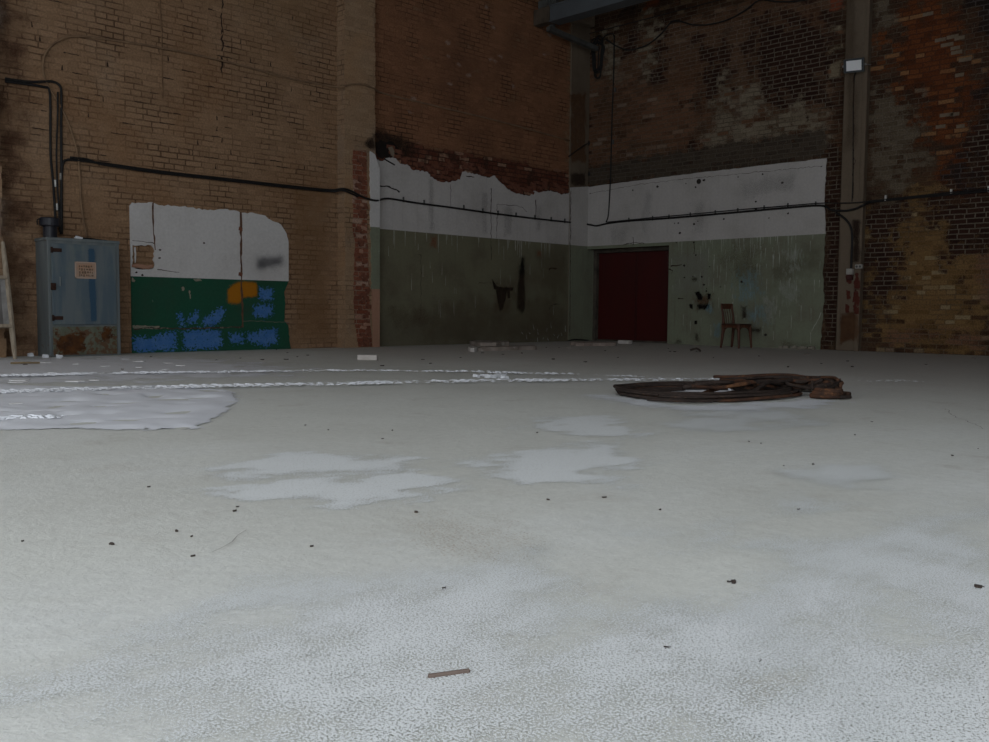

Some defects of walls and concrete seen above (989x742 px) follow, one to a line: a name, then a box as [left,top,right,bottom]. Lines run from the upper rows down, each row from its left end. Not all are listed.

crack [218,0,226,73]
spalling [352,124,569,347]
peeling [131,279,279,353]